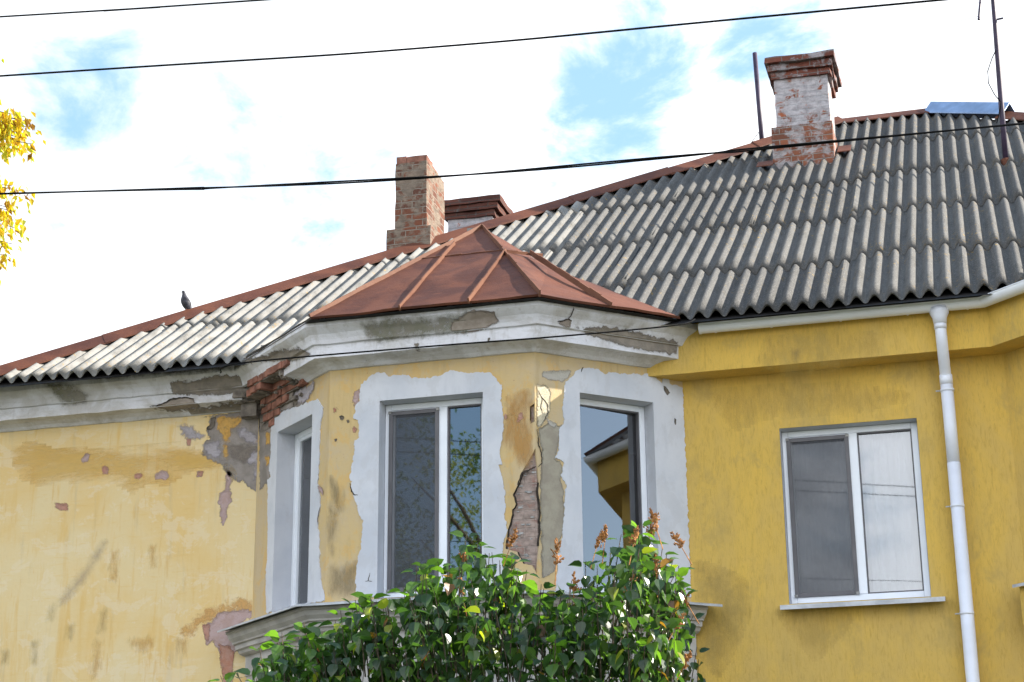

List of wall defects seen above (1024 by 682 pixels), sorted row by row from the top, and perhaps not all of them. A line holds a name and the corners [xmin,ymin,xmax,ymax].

spalling [451,310,499,341]
peeling [558,307,678,355]
peeling [150,347,314,525]
spalling [506,384,556,565]
peeling [202,609,252,682]